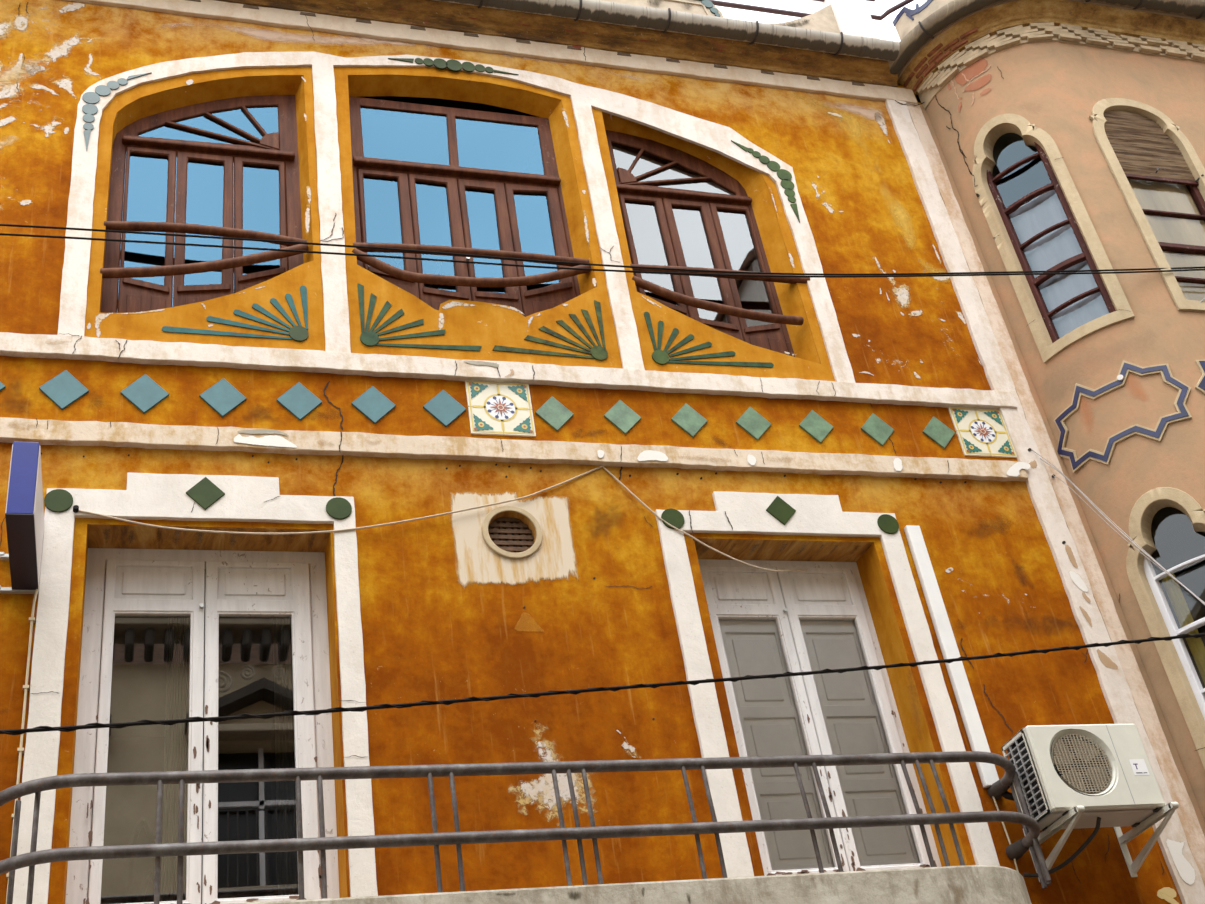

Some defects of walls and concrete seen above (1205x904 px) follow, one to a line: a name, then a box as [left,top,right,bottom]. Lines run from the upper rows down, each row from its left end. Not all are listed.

peeling [0,2,103,137]
peeling [874,110,890,143]
crack [895,65,1004,187]
peeling [875,257,922,316]
crack [323,381,344,496]
peeling [508,727,594,821]